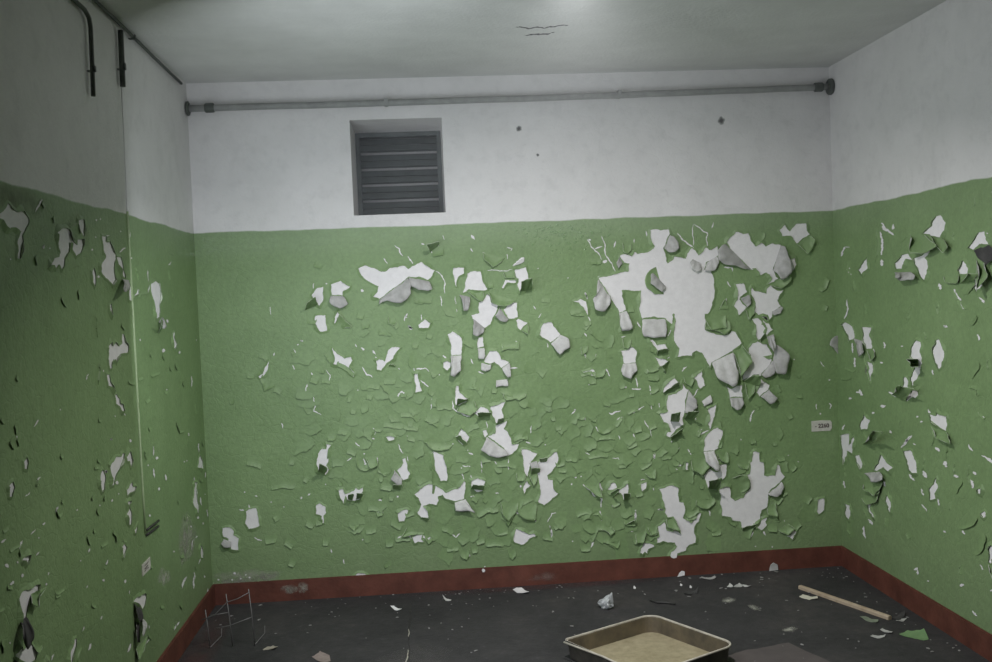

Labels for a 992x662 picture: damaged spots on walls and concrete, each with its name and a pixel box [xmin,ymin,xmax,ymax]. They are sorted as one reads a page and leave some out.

peeling [90,233,177,352]
peeling [305,260,437,334]
peeling [894,213,947,284]
peeling [943,228,992,293]
peeling [440,264,570,507]
peeling [572,221,816,533]
peeling [891,337,947,404]
peeling [220,506,262,553]
peeling [391,451,487,546]
peeling [605,480,703,558]
peeling [840,412,894,523]
peeling [13,579,46,662]